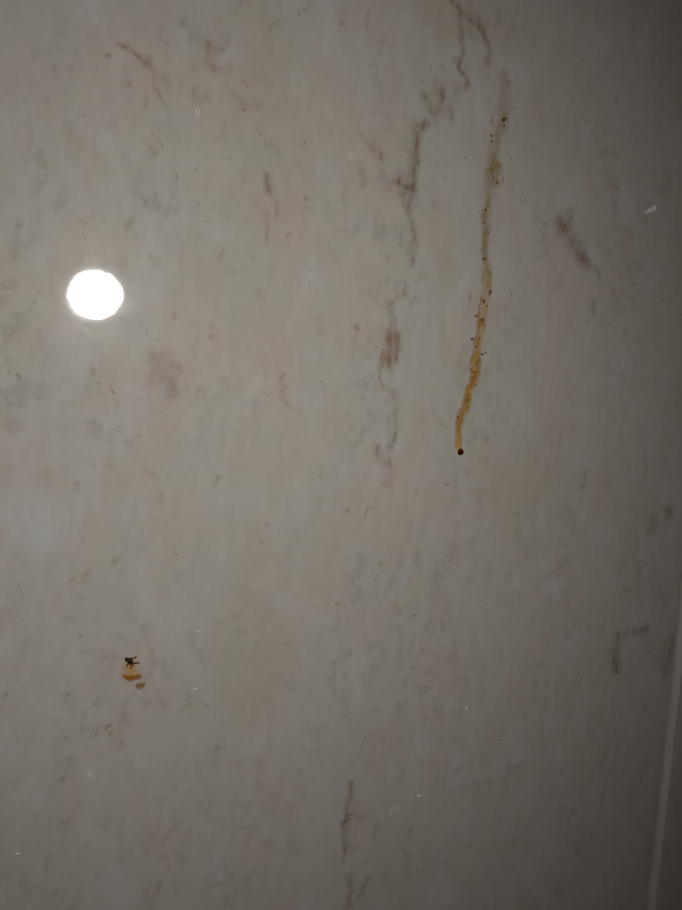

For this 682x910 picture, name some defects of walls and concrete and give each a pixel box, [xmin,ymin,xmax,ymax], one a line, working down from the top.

rust [456,314,487,455]